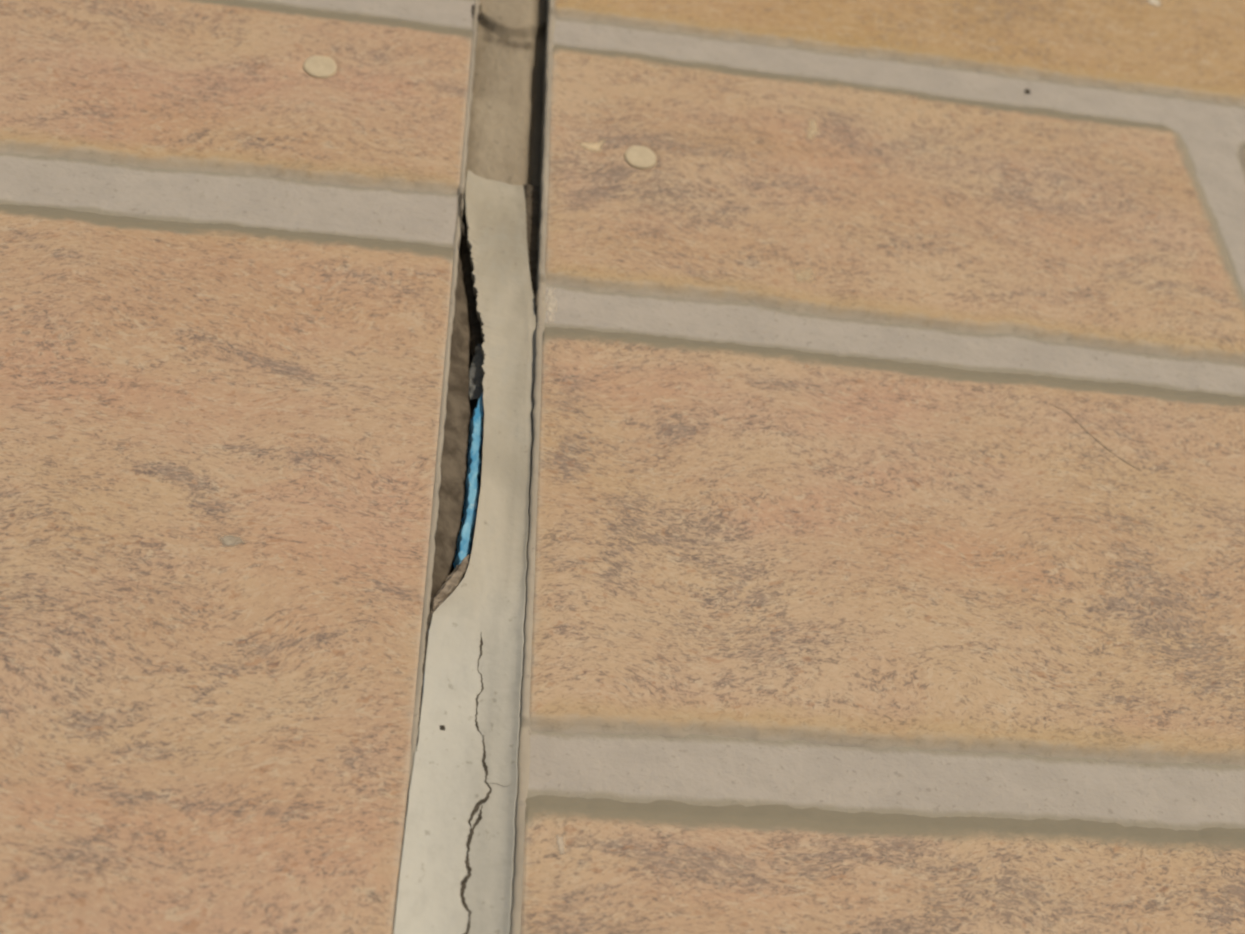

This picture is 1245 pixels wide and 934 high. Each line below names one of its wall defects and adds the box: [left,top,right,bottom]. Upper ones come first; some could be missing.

crack [460,632,506,934]